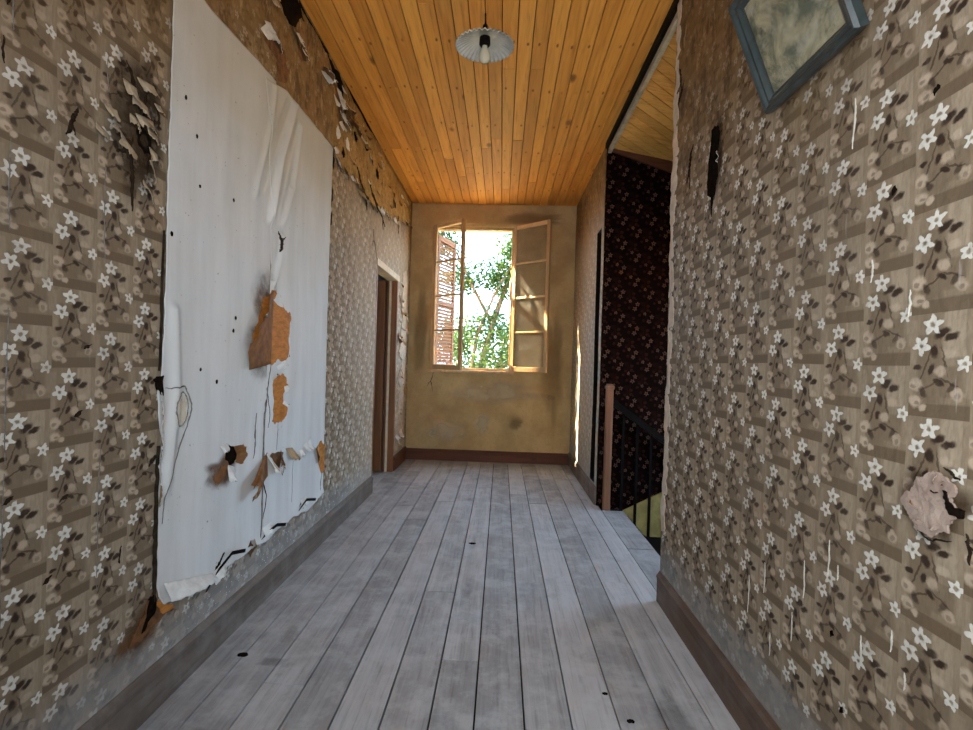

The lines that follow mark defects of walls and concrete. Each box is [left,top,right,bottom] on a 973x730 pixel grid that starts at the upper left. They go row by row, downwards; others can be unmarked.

peeling [261,20,288,84]
spalling [96,77,166,205]
flaking render [272,0,413,229]
spalling [707,120,723,217]
spalling [225,445,237,465]